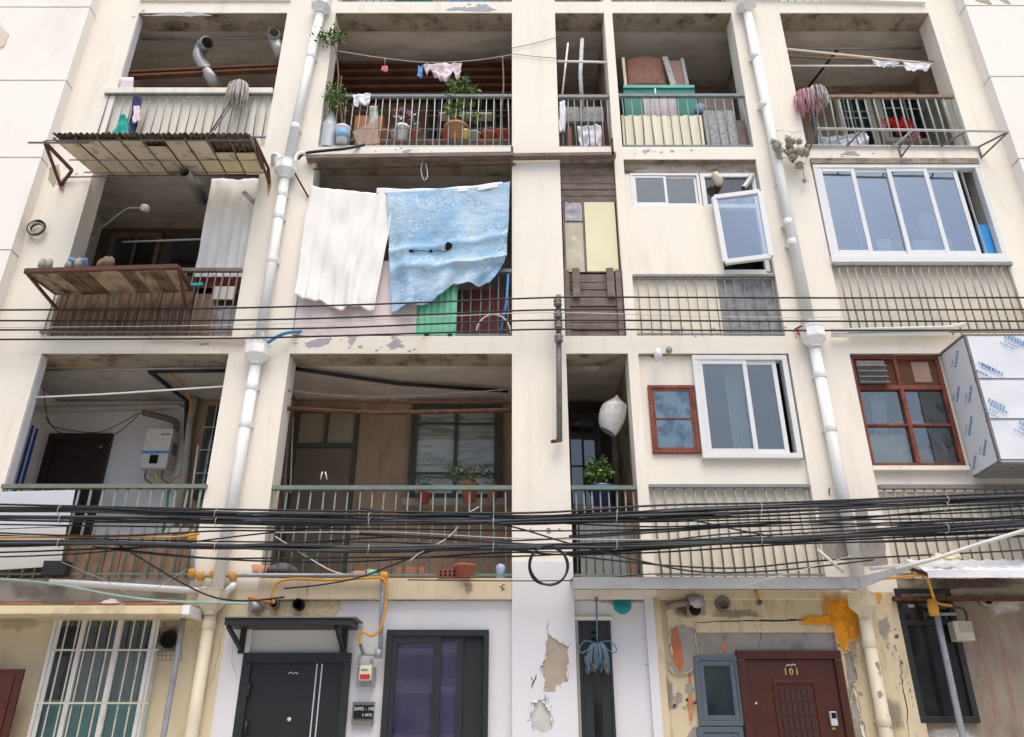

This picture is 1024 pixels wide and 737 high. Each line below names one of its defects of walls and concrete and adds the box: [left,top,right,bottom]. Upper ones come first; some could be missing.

peeling [294,334,363,348]
peeling [375,336,425,352]
spalling [527,634,571,731]
peeling [668,625,699,710]
peeling [838,639,867,737]
crack [899,657,909,733]